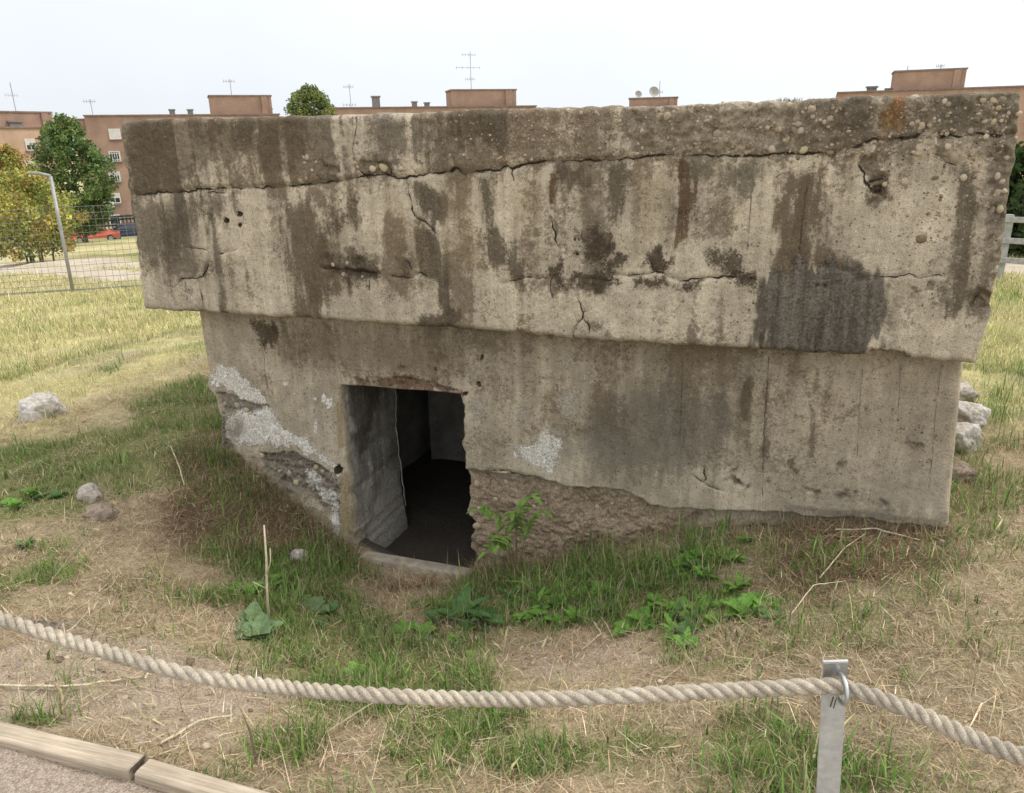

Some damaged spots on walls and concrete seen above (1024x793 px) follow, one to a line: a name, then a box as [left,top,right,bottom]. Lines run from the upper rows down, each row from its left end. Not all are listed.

leakage [131,189,235,313]
crack [177,247,238,307]
leakage [250,196,359,350]
leakage [412,180,462,329]
crack [136,115,1010,232]
crack [507,260,755,336]
spalling [428,94,1022,315]
leakage [748,161,890,354]
crack [832,267,945,280]
leakage [937,162,980,321]
peeling [210,363,343,536]
spalling [470,469,702,568]